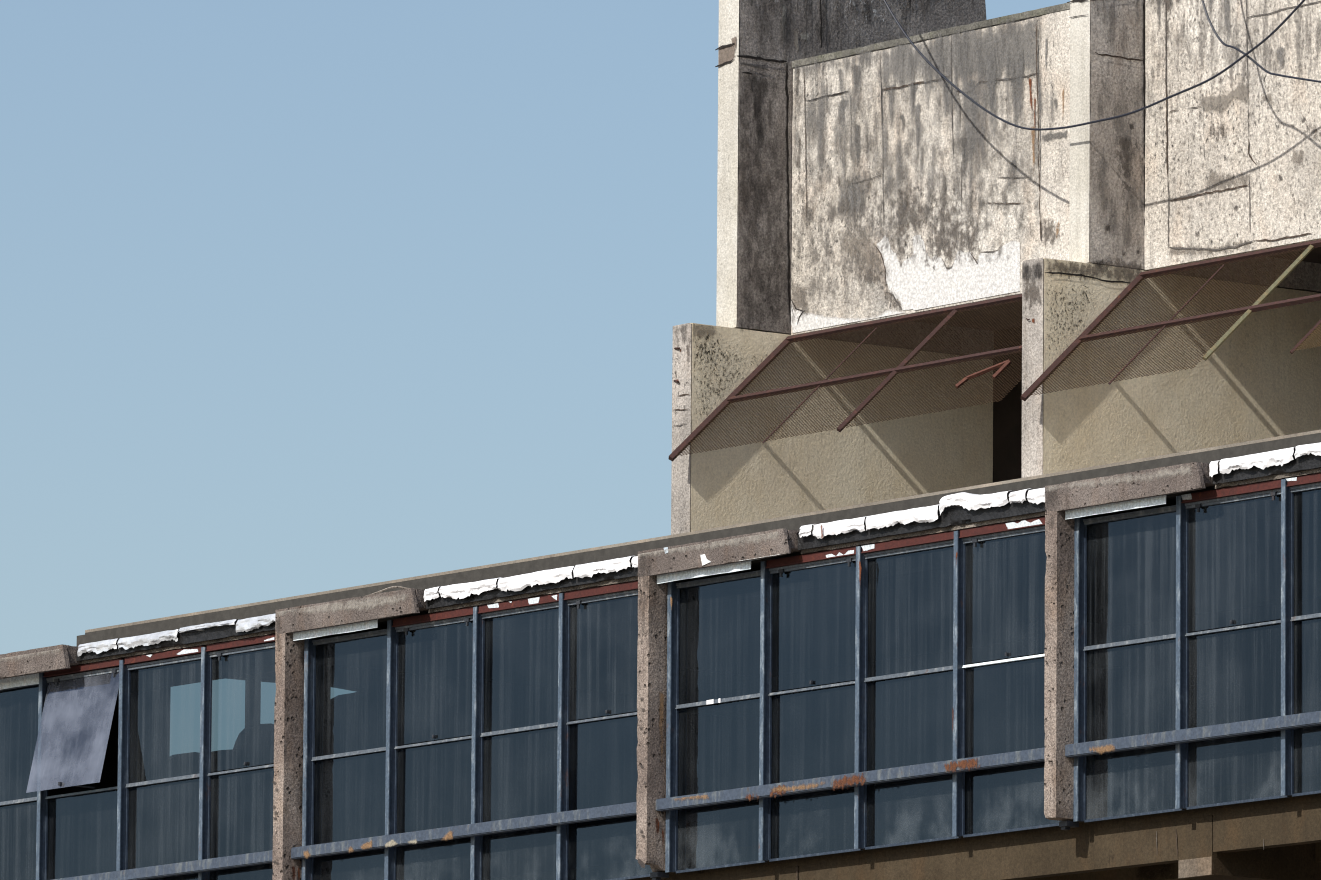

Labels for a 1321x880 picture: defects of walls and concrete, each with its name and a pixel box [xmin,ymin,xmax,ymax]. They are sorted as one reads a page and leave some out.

damp [791,0,1321,356]
damp [1049,468,1189,491]
rust [945,759,977,772]
rust [746,774,865,800]
rust [349,840,416,851]